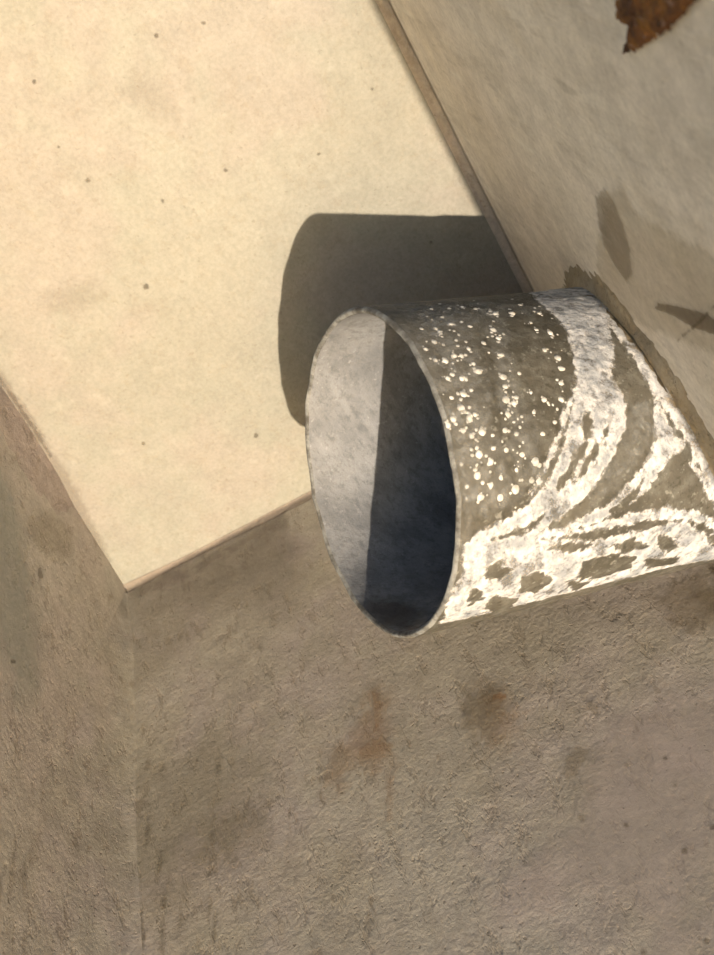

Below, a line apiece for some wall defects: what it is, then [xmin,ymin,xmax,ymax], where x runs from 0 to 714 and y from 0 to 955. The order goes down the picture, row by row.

rust [615,0,697,54]